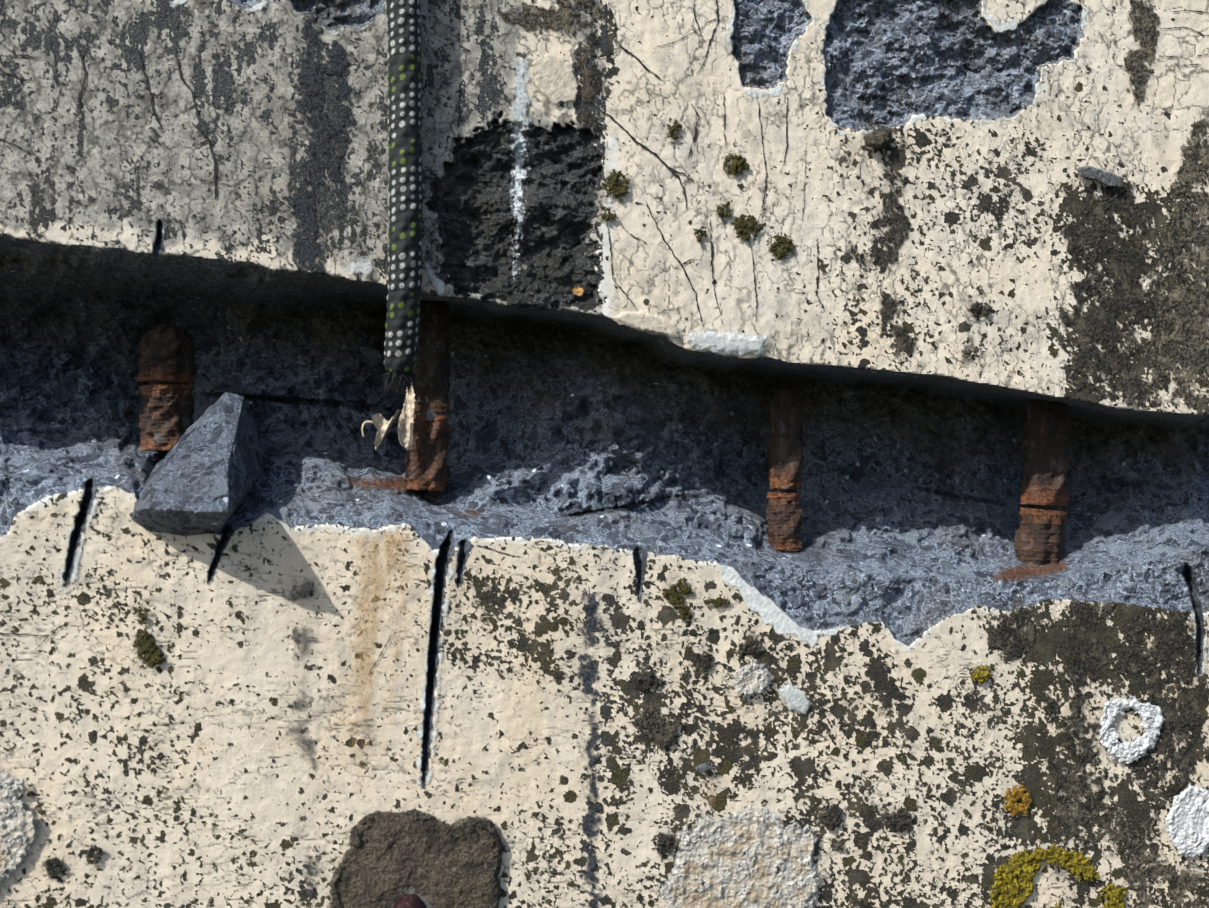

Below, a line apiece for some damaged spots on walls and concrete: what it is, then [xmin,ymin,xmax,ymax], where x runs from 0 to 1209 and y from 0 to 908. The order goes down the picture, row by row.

peeling [532,53,578,105]
spalling [726,0,1089,136]
spalling [425,111,607,315]
peeling [344,259,372,285]
spalling [0,475,18,536]
spalling [721,545,1209,647]